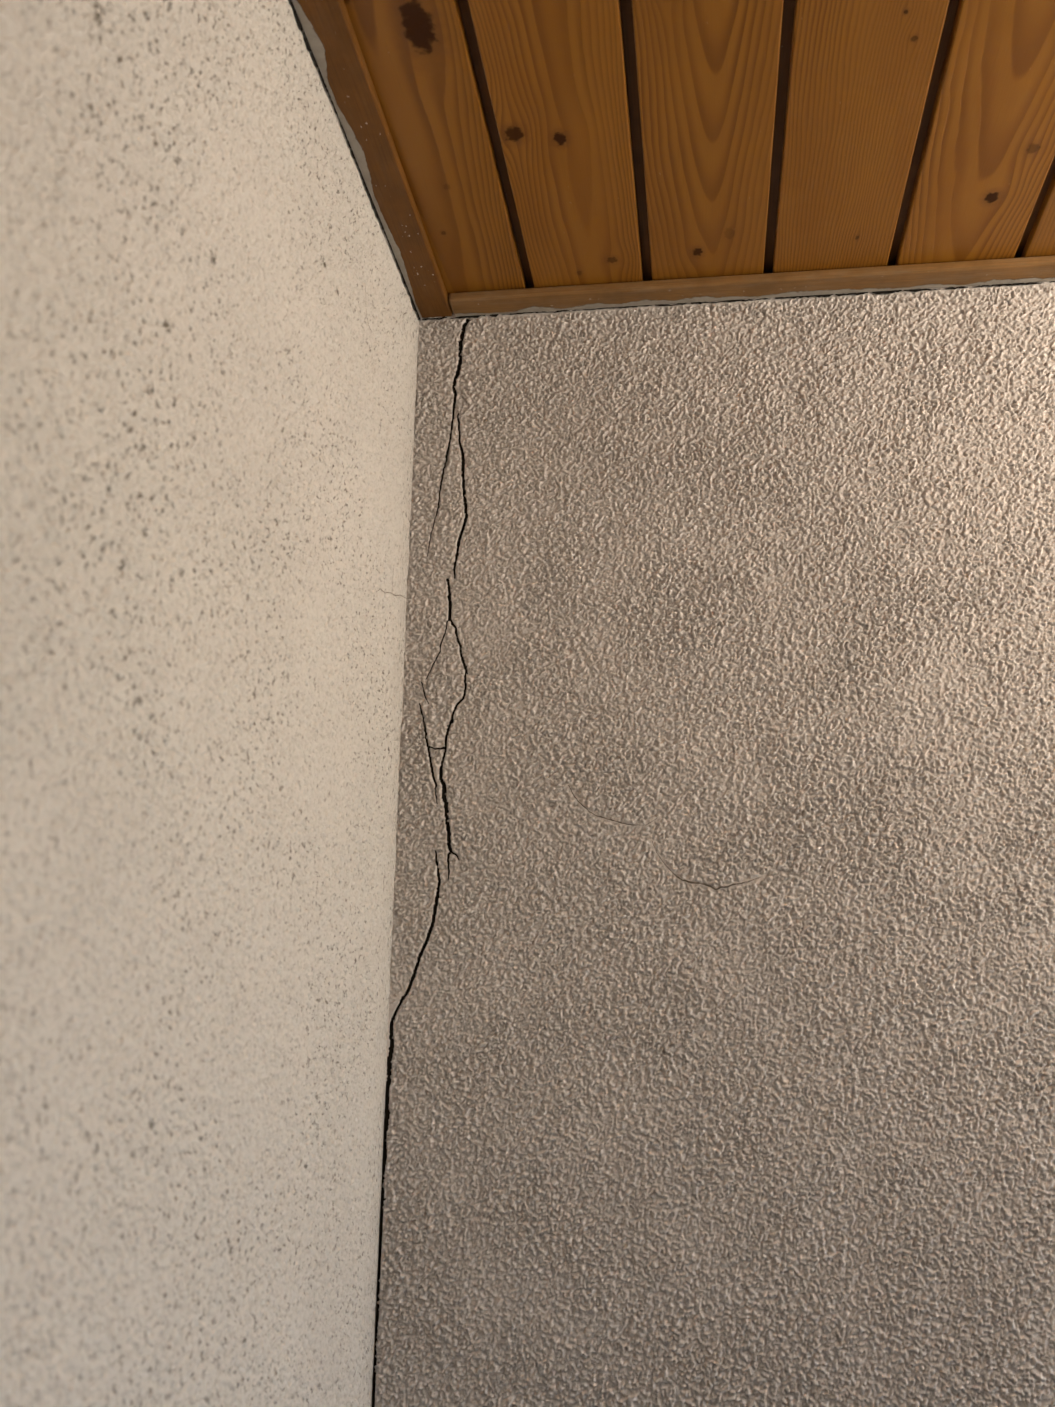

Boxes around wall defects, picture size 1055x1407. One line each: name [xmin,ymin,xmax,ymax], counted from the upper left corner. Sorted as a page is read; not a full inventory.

crack [290,0,1055,1407]